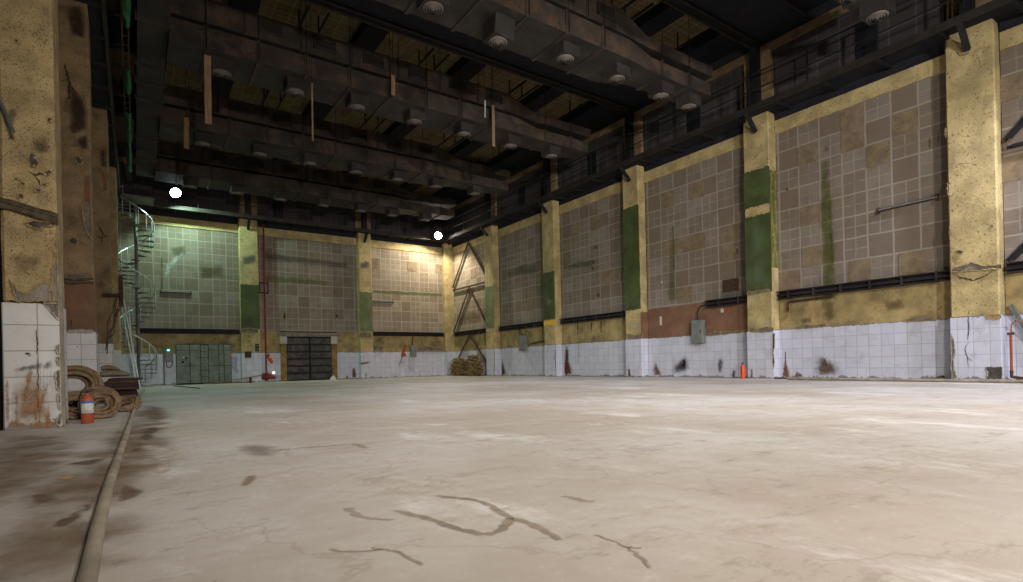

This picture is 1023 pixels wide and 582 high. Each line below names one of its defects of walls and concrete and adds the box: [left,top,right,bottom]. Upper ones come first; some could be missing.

flaking render [950,262,1002,273]
rust [6,373,51,427]